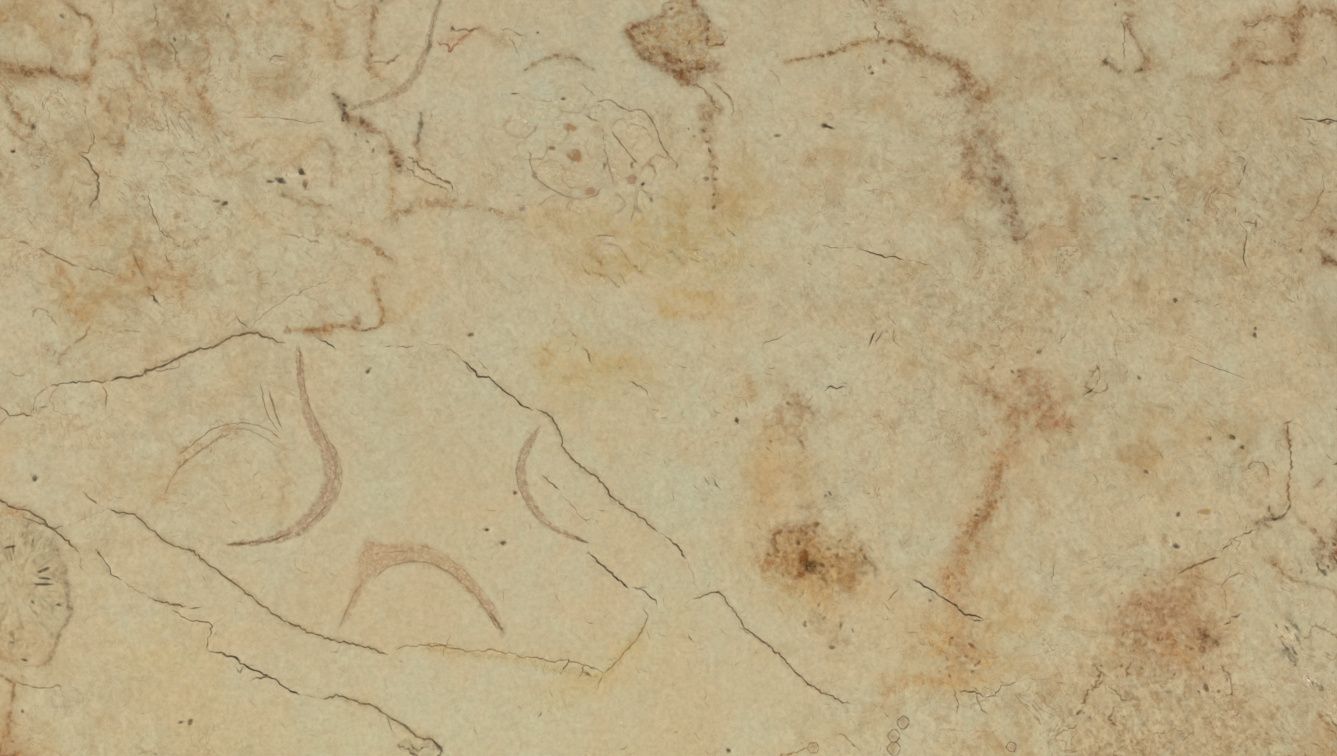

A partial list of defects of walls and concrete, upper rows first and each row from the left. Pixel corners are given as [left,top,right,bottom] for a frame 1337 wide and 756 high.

crack [4,319,282,416]
crack [464,362,684,557]
crack [0,500,119,579]
crack [154,600,441,750]
crack [91,499,656,675]
crack [697,591,843,703]